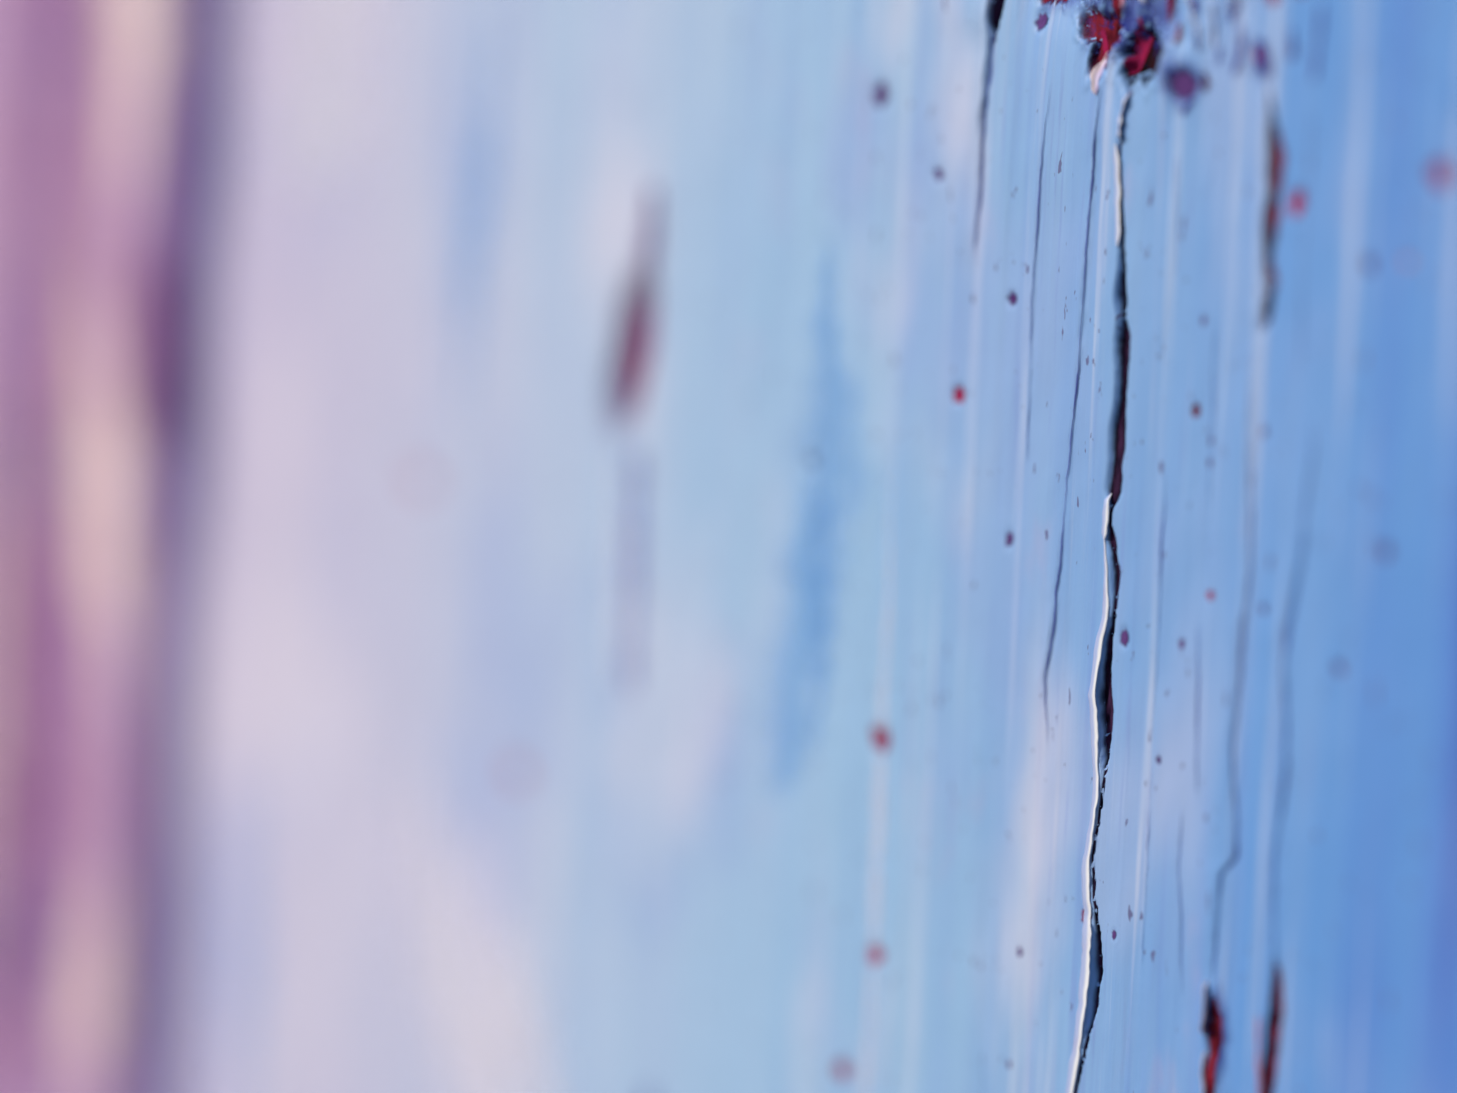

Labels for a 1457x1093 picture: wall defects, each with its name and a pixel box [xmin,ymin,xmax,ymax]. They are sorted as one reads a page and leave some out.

crack [974,0,1005,247]
crack [1030,128,1045,339]
peeling [1090,50,1109,95]
peeling [1216,0,1270,75]
crack [1262,90,1285,330]
crack [1044,98,1131,1093]
spalling [1200,980,1225,1093]
spalling [1256,963,1284,1093]